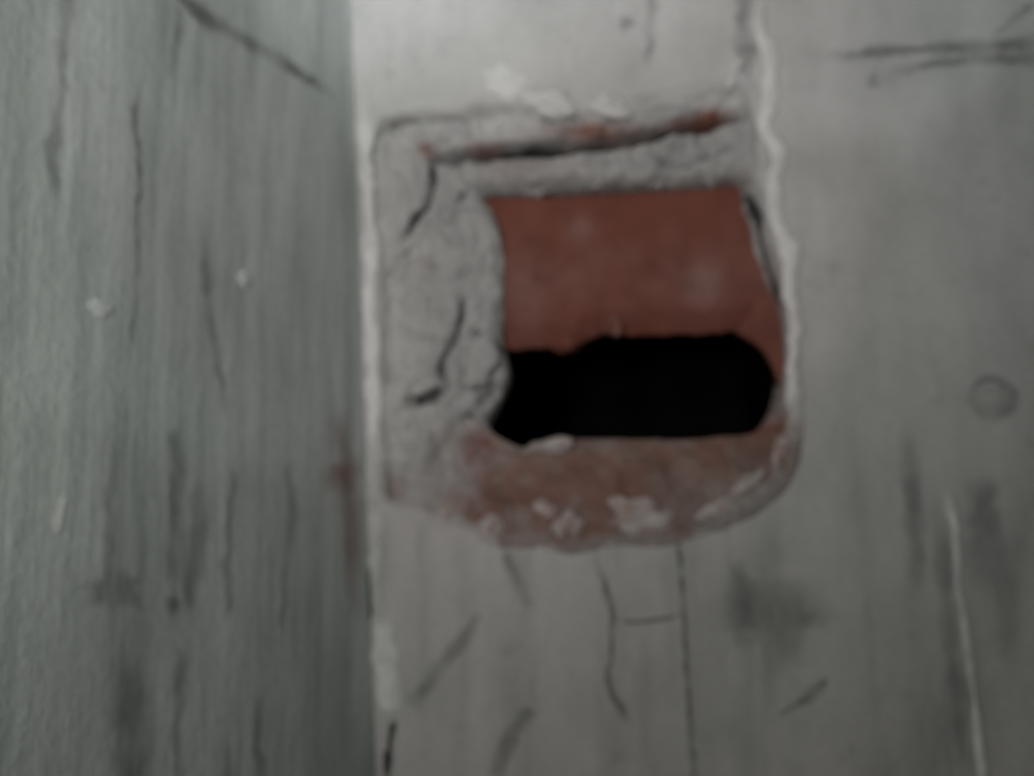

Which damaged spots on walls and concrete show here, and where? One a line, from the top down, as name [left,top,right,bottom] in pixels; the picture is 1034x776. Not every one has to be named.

spalling [367,56,804,549]